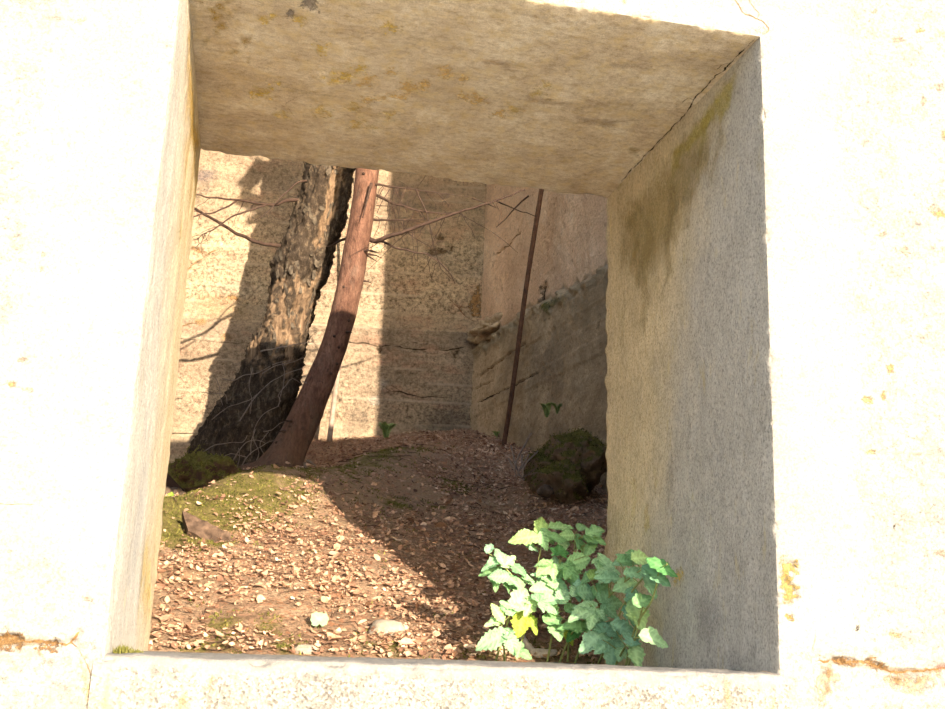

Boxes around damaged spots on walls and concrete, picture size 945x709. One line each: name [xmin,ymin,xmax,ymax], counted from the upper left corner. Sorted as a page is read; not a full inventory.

crack [0,631,91,675]
crack [803,602,945,695]